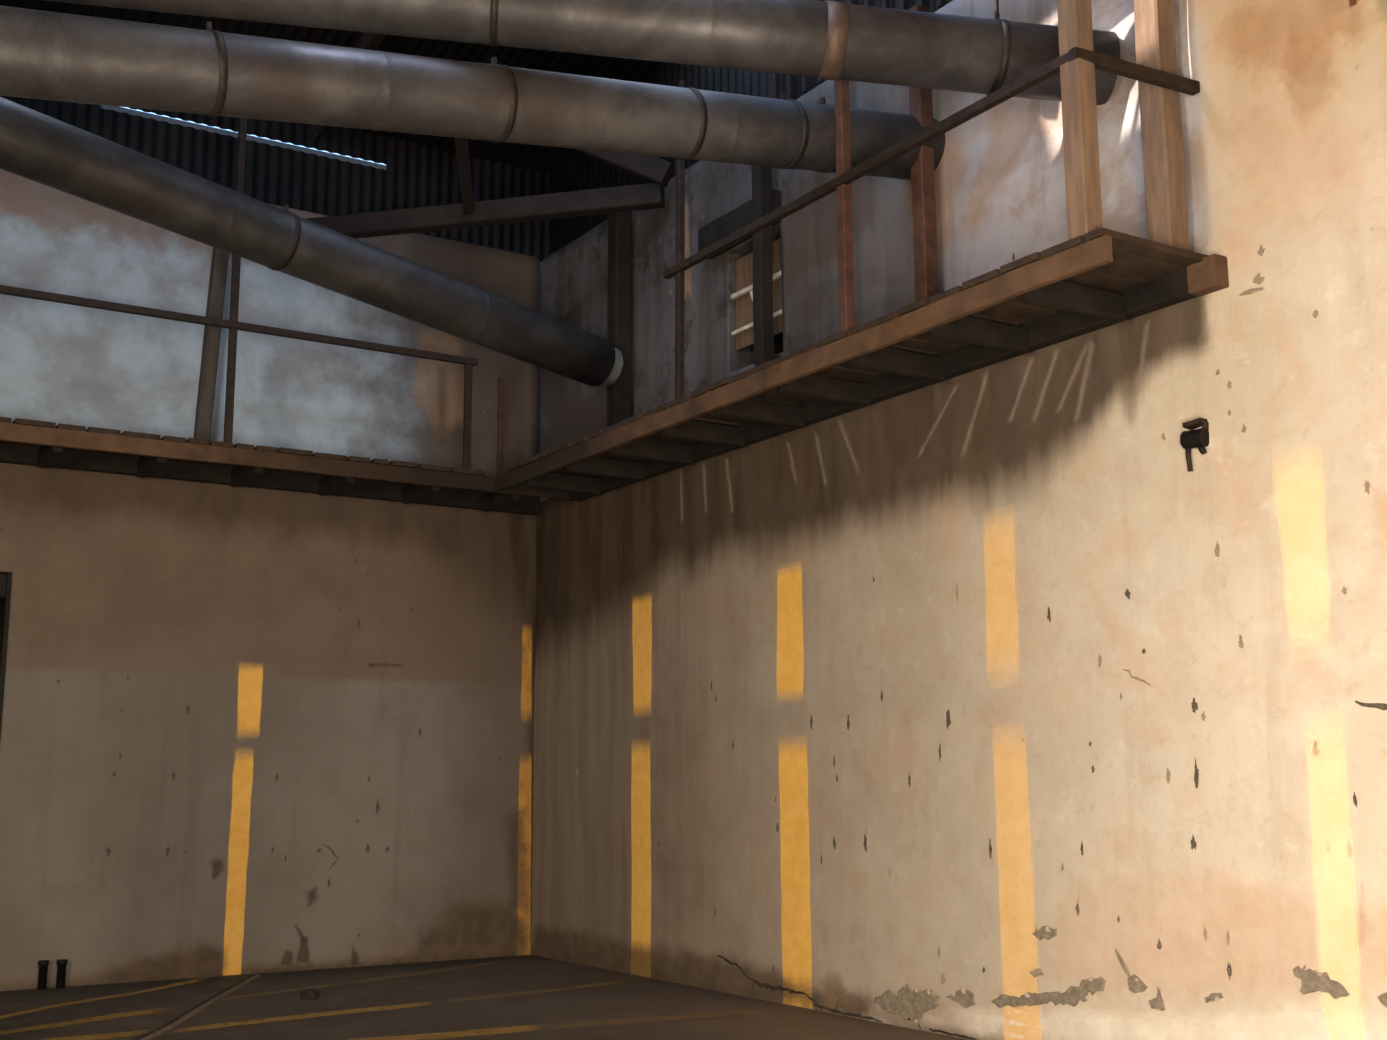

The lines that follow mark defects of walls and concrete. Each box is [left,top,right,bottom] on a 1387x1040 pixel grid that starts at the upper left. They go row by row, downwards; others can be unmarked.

spalling [1031,925,1057,940]
crack [717,955,978,1040]
spalling [874,946,975,1025]
spalling [992,968,1106,1008]
crack [1115,949,1130,977]
spalling [1293,965,1351,999]